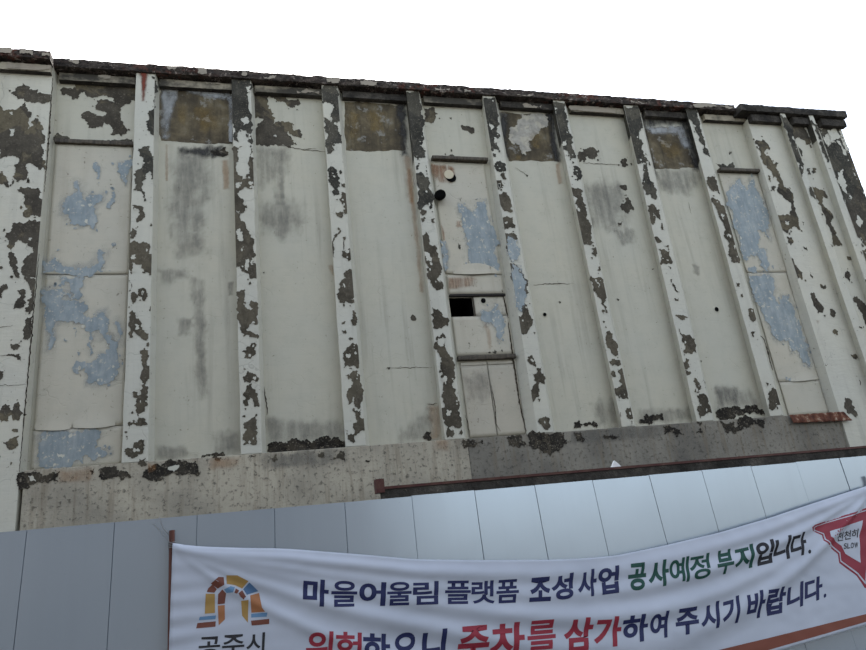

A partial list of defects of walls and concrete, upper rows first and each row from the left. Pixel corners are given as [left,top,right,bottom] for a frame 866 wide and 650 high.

peeling [146,76,158,135]
damp [344,102,406,152]
damp [645,126,696,169]
peeling [407,91,548,335]
peeling [0,83,153,469]
peeling [232,79,303,445]
peeling [791,257,836,318]
peeling [852,296,866,328]
rust [789,412,852,423]
peeling [843,397,858,418]